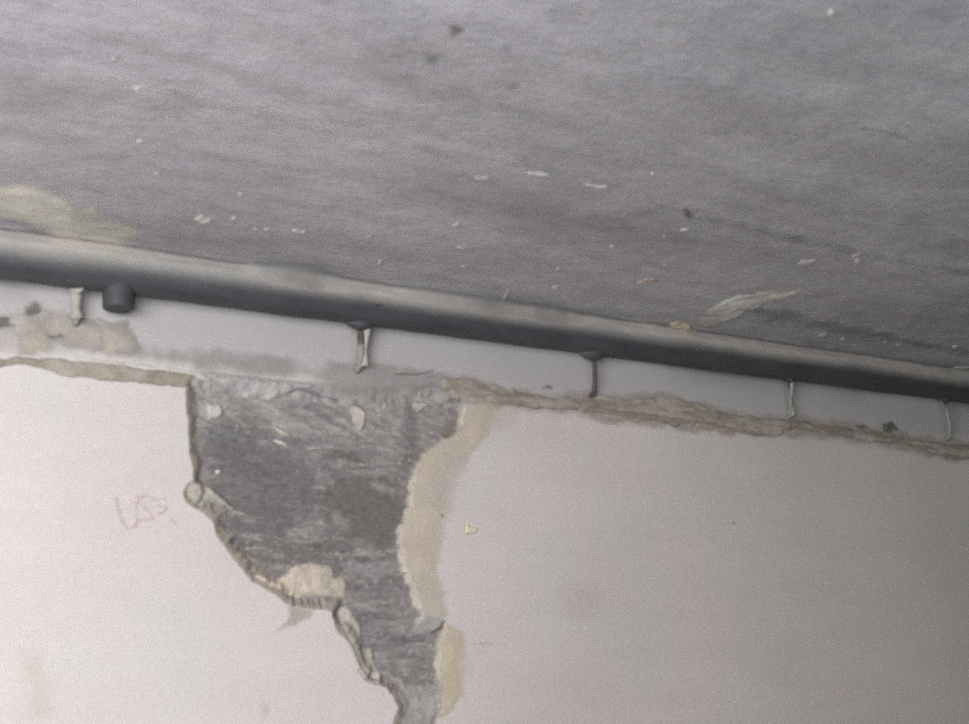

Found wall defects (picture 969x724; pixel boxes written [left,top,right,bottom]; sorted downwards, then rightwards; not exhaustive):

spalling [0,354,969,724]